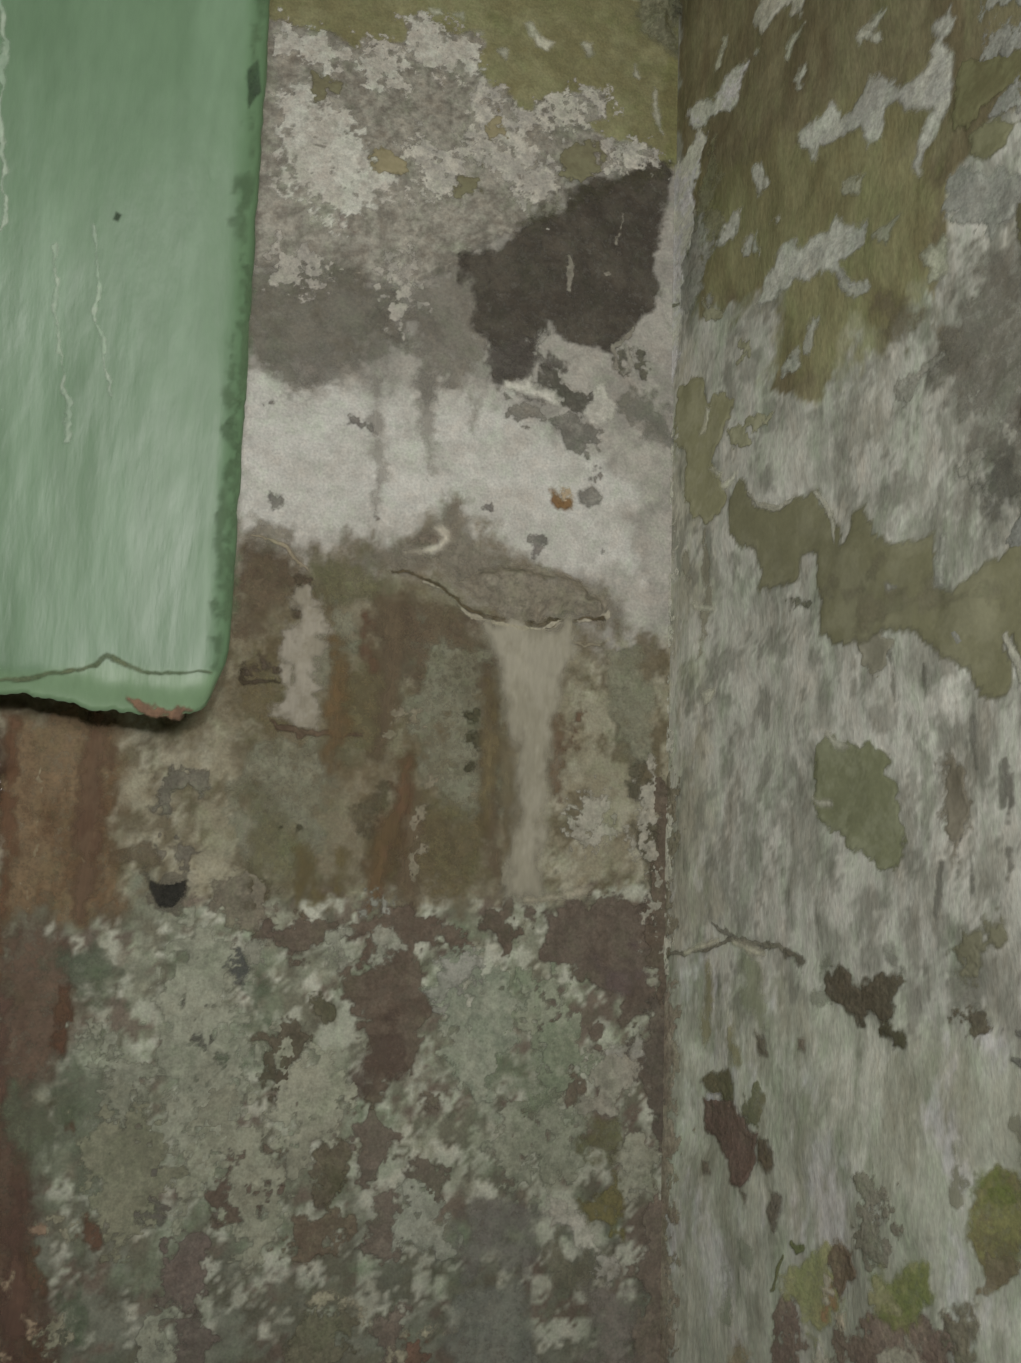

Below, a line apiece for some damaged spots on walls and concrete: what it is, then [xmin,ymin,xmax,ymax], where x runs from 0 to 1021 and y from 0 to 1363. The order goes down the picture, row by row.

damp [248,161,673,445]
peeling [254,0,1021,698]
crack [392,570,610,647]
corrosion [127,698,193,720]
peeling [812,731,907,871]
peeling [934,755,976,915]
corrosion [0,703,127,1363]
peeling [32,675,682,1363]
flaking render [811,947,906,1049]
flaking render [694,1069,773,1199]
flaking render [828,1172,904,1296]
flaking render [771,1296,979,1363]